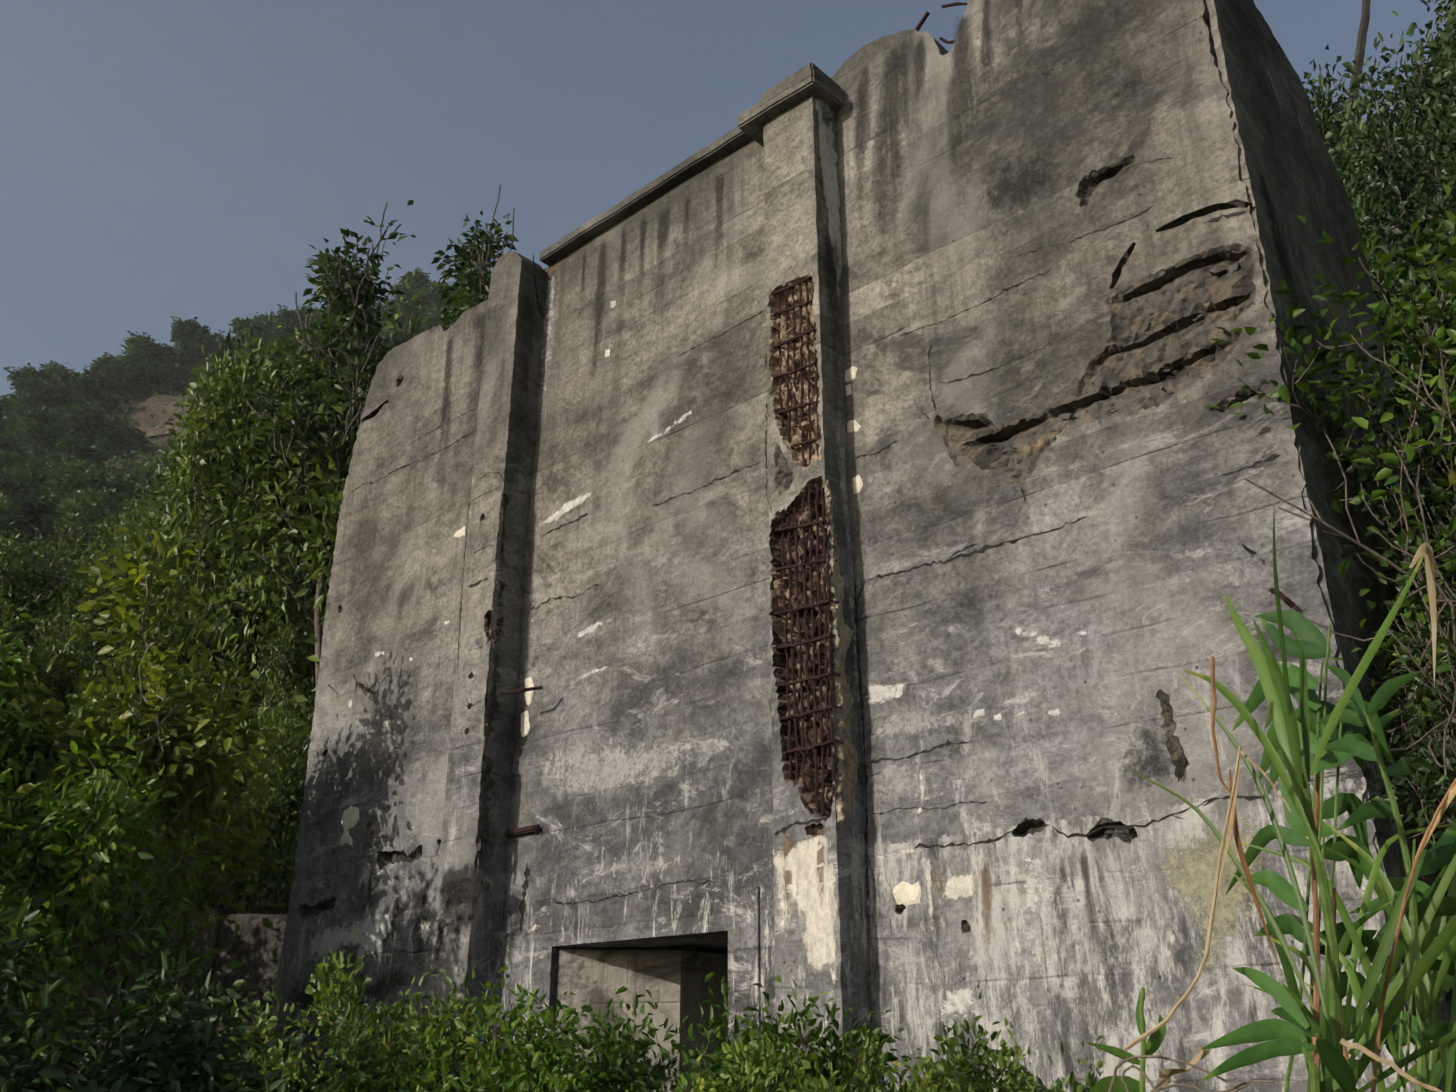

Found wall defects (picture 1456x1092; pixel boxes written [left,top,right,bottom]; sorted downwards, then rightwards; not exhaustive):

water stain [950,0,990,148]
water stain [582,212,668,367]
water stain [716,176,724,240]
water stain [986,159,1050,211]
crack [890,199,1253,340]
spalling [920,243,1256,502]
spalling [763,272,861,826]
flaking render [852,475,863,494]
crack [854,516,1087,975]
spalling [366,821,441,872]
crack [774,817,828,836]
crack [1052,795,1262,838]